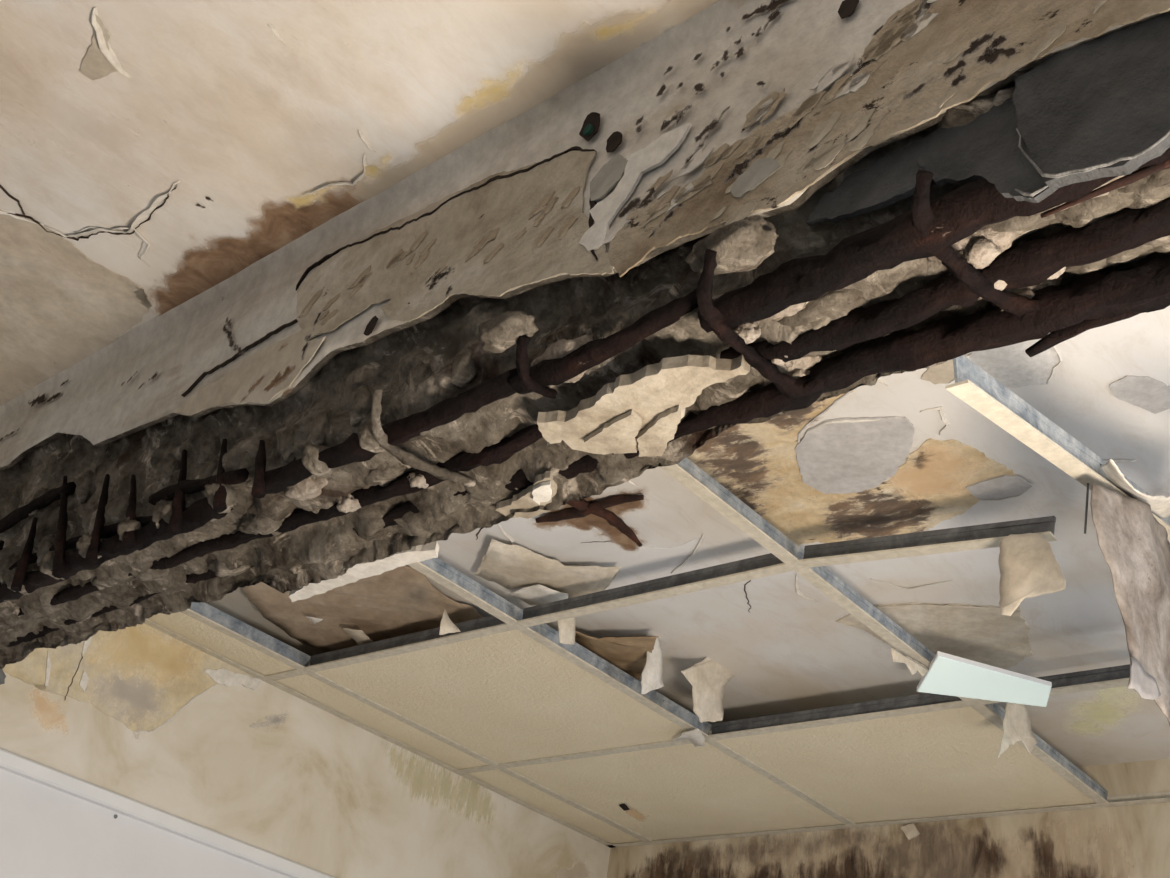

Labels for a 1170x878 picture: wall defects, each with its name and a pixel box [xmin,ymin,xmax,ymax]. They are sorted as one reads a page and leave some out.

leakage [943,31,1016,87]
leakage [150,0,718,316]
crack [0,185,177,241]
crack [296,146,596,291]
crack [588,199,598,260]
crack [181,319,298,397]
rust [241,366,295,401]
spalling [0,0,1170,685]
leakage [695,424,776,516]
leakage [825,490,935,539]
peeling [2,623,263,733]
peeling [673,728,705,747]